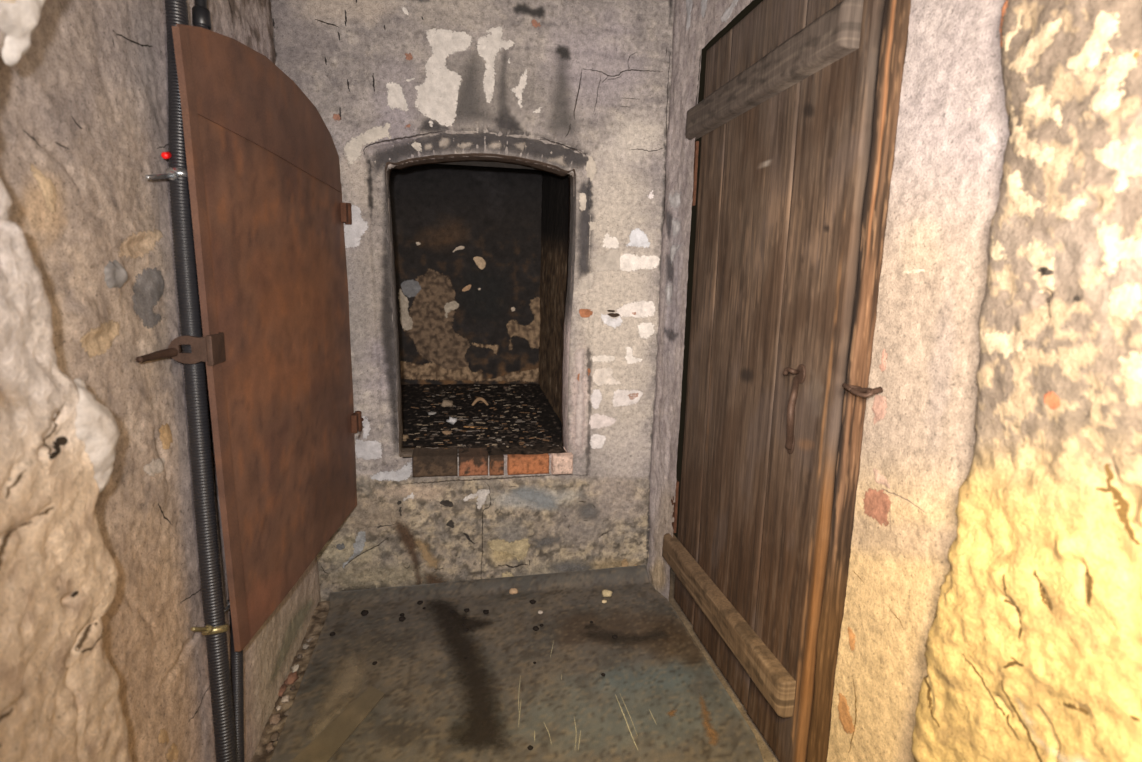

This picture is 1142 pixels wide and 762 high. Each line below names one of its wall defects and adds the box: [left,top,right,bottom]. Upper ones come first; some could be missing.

crack [363,131,442,155]
peeling [344,26,515,165]
peeling [511,68,542,113]
damp [553,74,571,130]
crack [544,49,670,211]
peeling [578,249,620,292]
spalling [398,268,540,389]
spalling [428,399,457,435]
crack [1095,464,1141,545]
crack [963,570,1052,762]